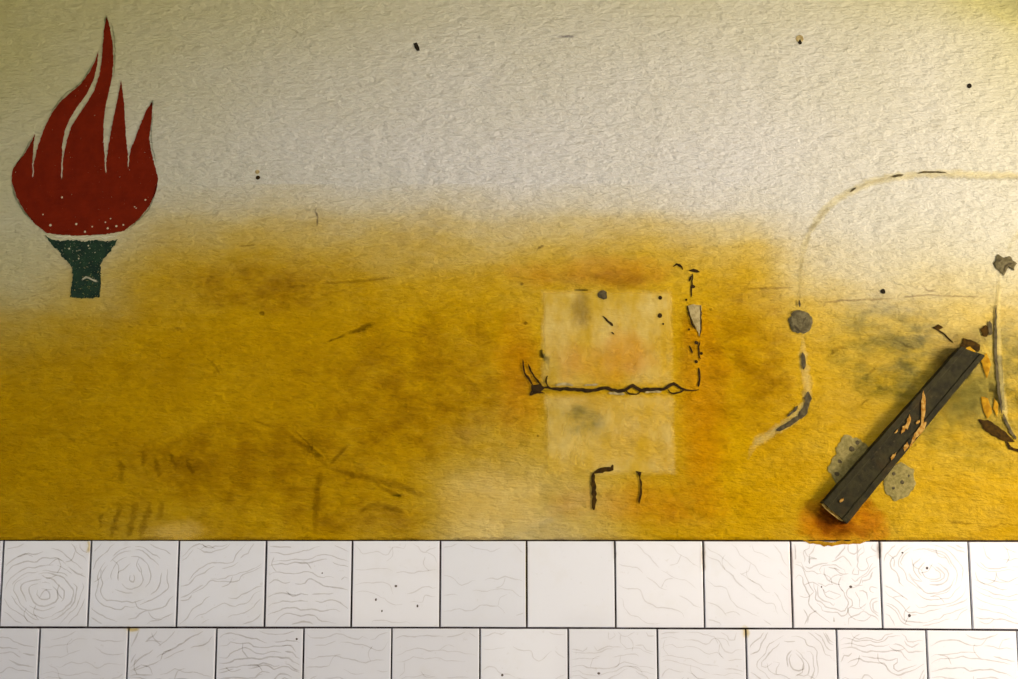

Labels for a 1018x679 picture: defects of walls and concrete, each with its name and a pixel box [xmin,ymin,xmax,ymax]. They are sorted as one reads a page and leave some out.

crack [522,269,703,396]